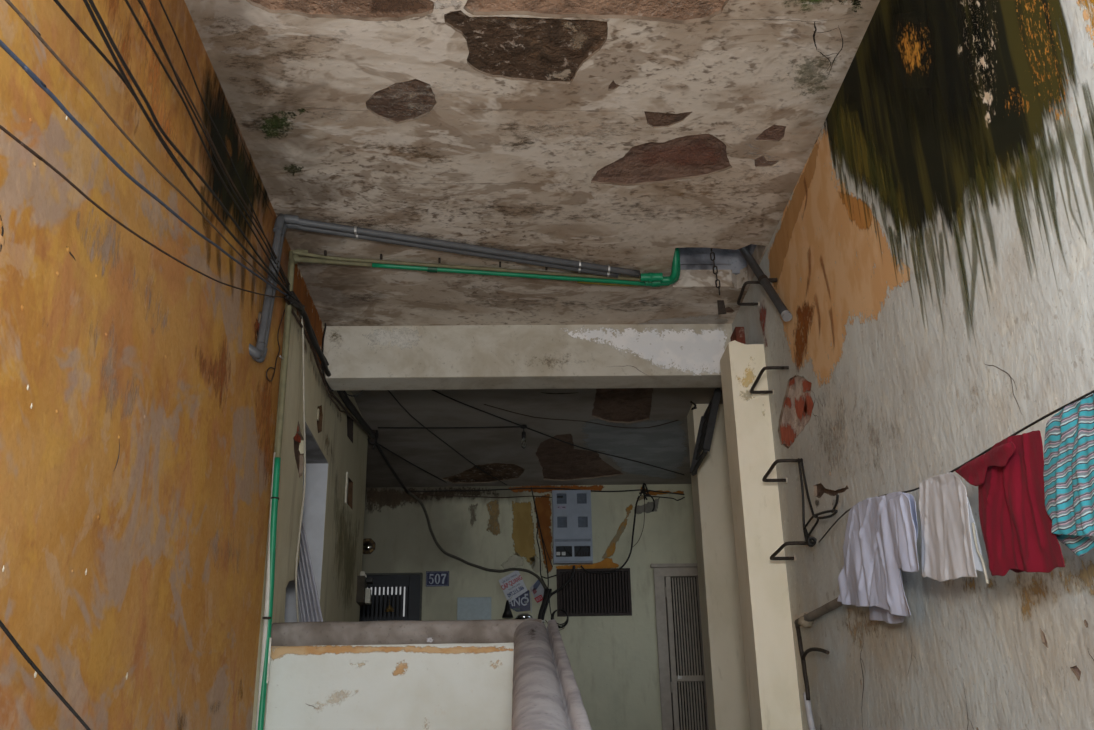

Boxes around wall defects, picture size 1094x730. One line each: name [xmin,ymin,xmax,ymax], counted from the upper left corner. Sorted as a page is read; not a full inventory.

spalling [246,0,729,84]
spalling [366,79,436,124]
spalling [644,111,692,128]
spalling [591,134,732,186]
flaking render [535,388,688,481]
spalling [442,463,525,483]